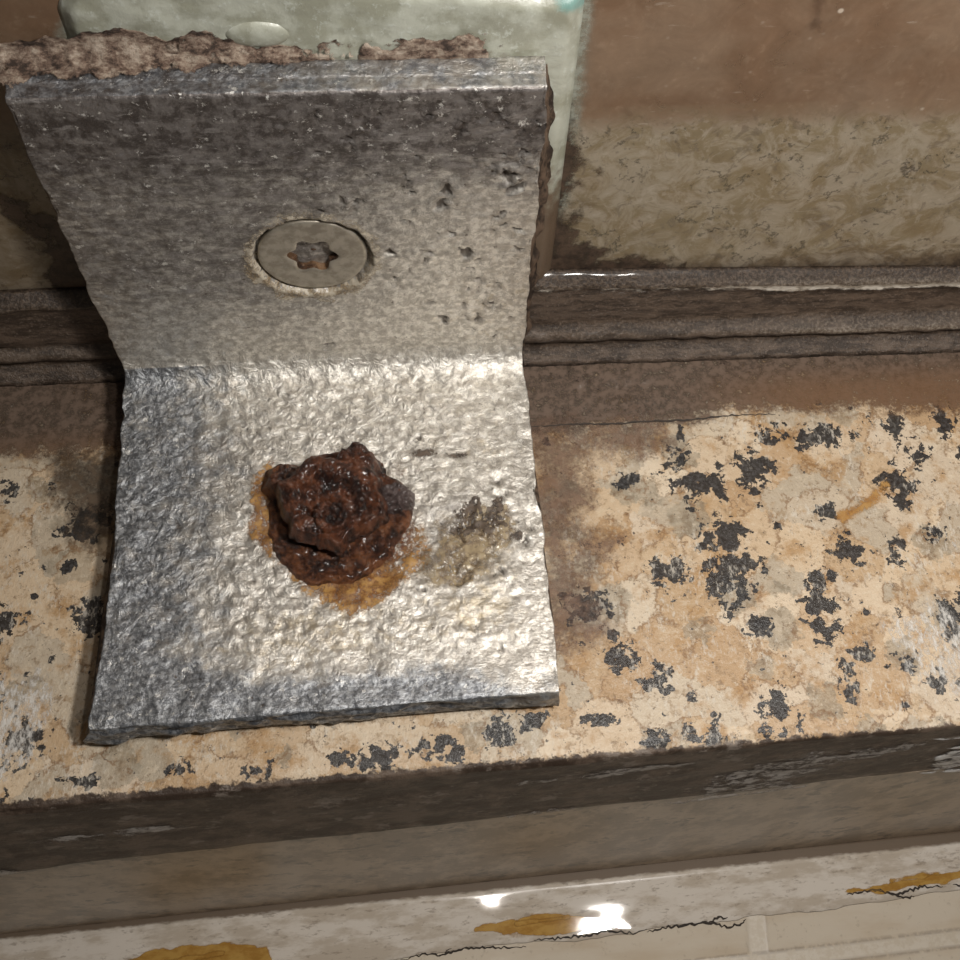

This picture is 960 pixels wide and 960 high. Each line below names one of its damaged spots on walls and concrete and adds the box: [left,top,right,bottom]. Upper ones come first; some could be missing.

peeling [358,33,489,61]
damp [523,352,960,652]
corrosion [247,441,523,616]
corrosion [846,871,960,894]
crack [847,884,960,899]
corrosion [130,942,272,960]
corrosion [474,913,618,936]
crack [401,916,746,960]